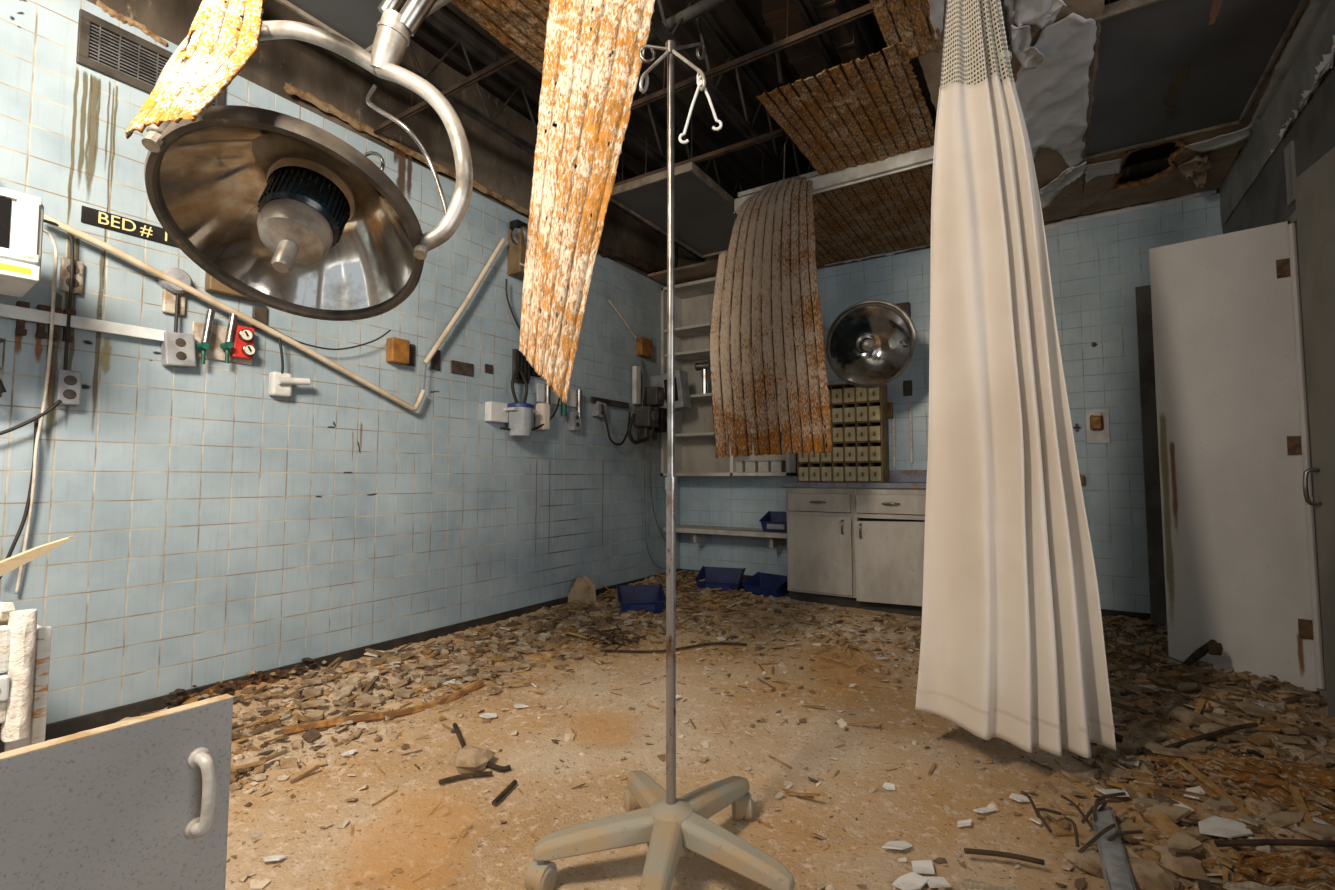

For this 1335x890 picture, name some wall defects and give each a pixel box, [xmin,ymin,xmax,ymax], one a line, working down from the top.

peeling [928,0,944,40]
damp [68,69,118,212]
peeling [1004,0,1253,209]
damp [67,235,80,261]
spalling [597,246,664,273]
spalling [1044,189,1216,230]
damp [93,228,110,411]
damp [46,325,74,438]